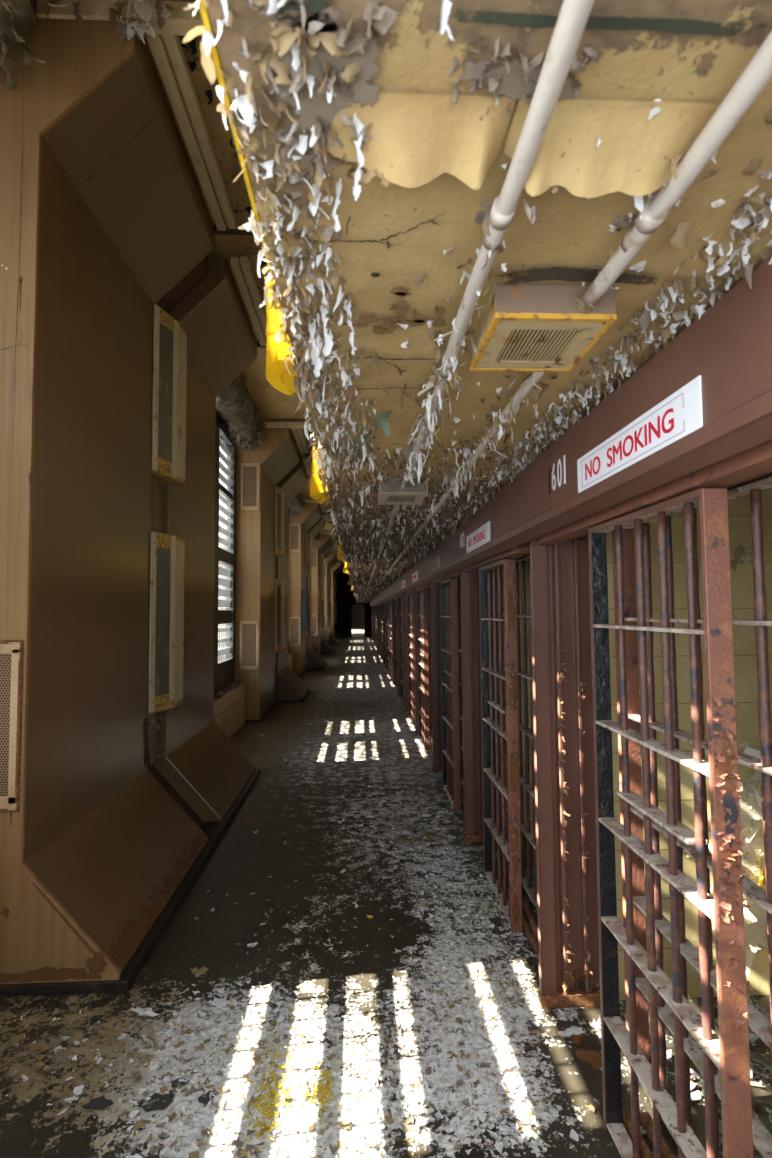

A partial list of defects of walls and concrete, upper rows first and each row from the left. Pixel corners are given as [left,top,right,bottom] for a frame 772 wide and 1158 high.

crack [312,213,445,246]
peeling [100,0,772,604]